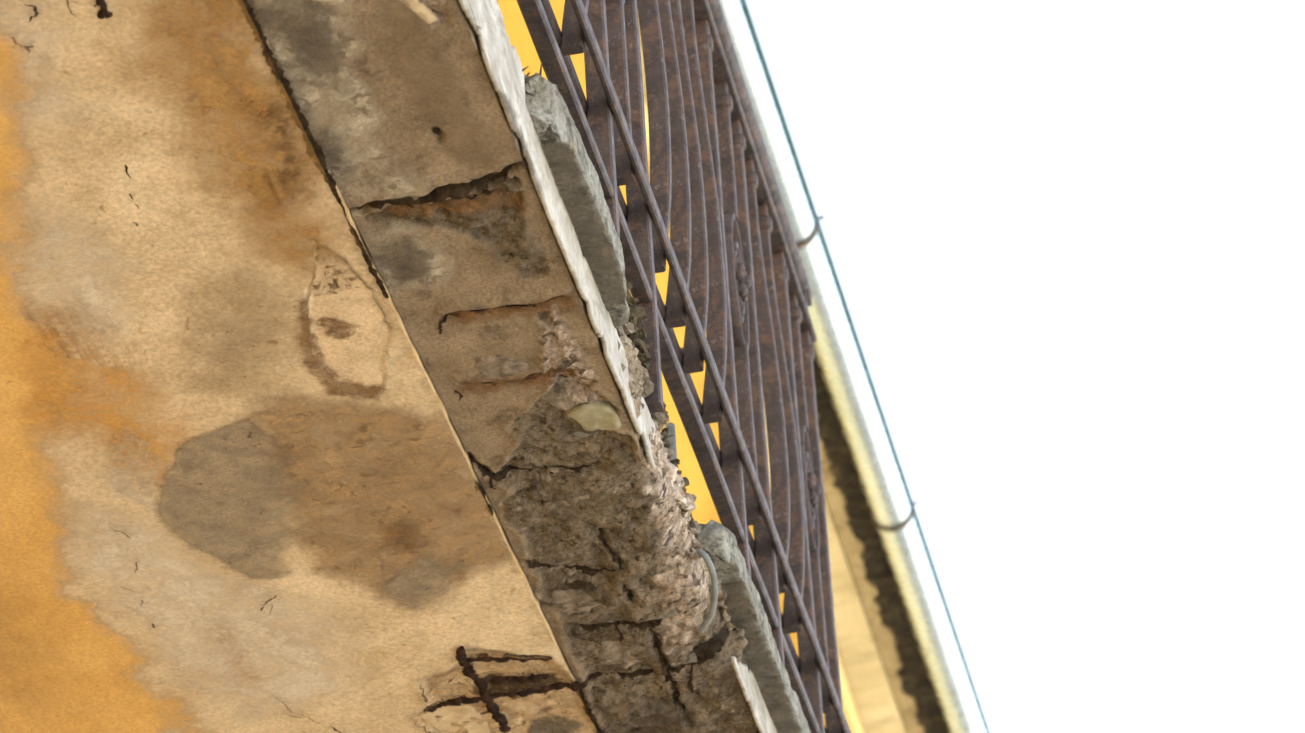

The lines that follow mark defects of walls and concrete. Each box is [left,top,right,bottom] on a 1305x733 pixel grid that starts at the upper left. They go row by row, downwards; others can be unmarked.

water stain [262,0,425,195]
crack [238,0,516,298]
water stain [388,0,492,165]
peeling [0,0,758,733]
crack [438,295,561,334]
water stain [157,397,511,607]
crack [527,526,744,733]